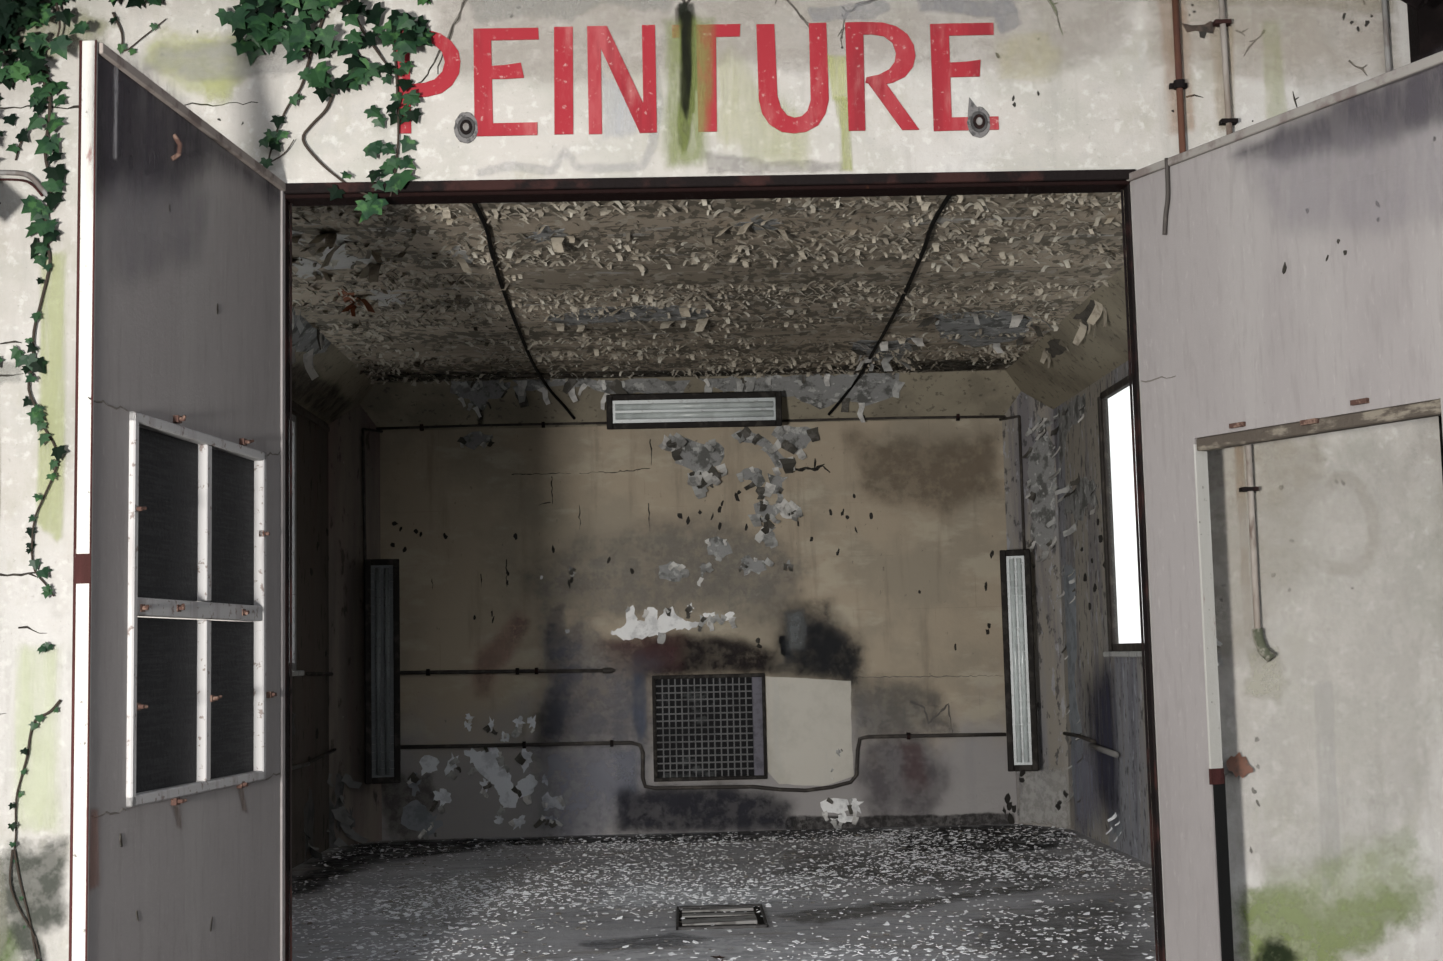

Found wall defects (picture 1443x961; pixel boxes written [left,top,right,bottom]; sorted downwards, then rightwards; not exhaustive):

damp [161,42,308,76]
peeling [292,192,1127,450]
peeling [659,425,819,586]
peeling [1022,394,1105,610]
peeling [611,603,737,644]
peeling [401,713,565,840]
damp [292,611,1118,927]
peeling [820,797,864,829]
damp [0,844,65,961]
damp [580,933,891,961]
damp [973,903,1136,961]
damp [1256,942,1296,961]